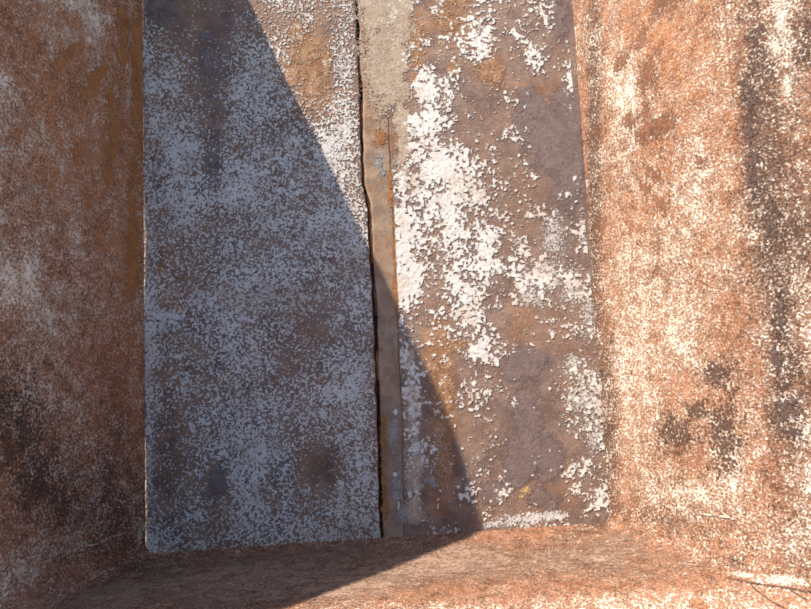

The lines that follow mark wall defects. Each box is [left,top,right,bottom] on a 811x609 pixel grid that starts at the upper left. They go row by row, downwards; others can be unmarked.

corrosion [276,21,334,114]
corrosion [429,0,477,34]
corrosion [445,53,509,88]
corrosion [613,0,684,145]
corrosion [77,0,186,367]
corrosion [387,166,401,329]
peeling [387,0,609,535]
corrosion [639,165,669,218]
corrosion [157,386,179,500]
corrosion [425,334,471,492]